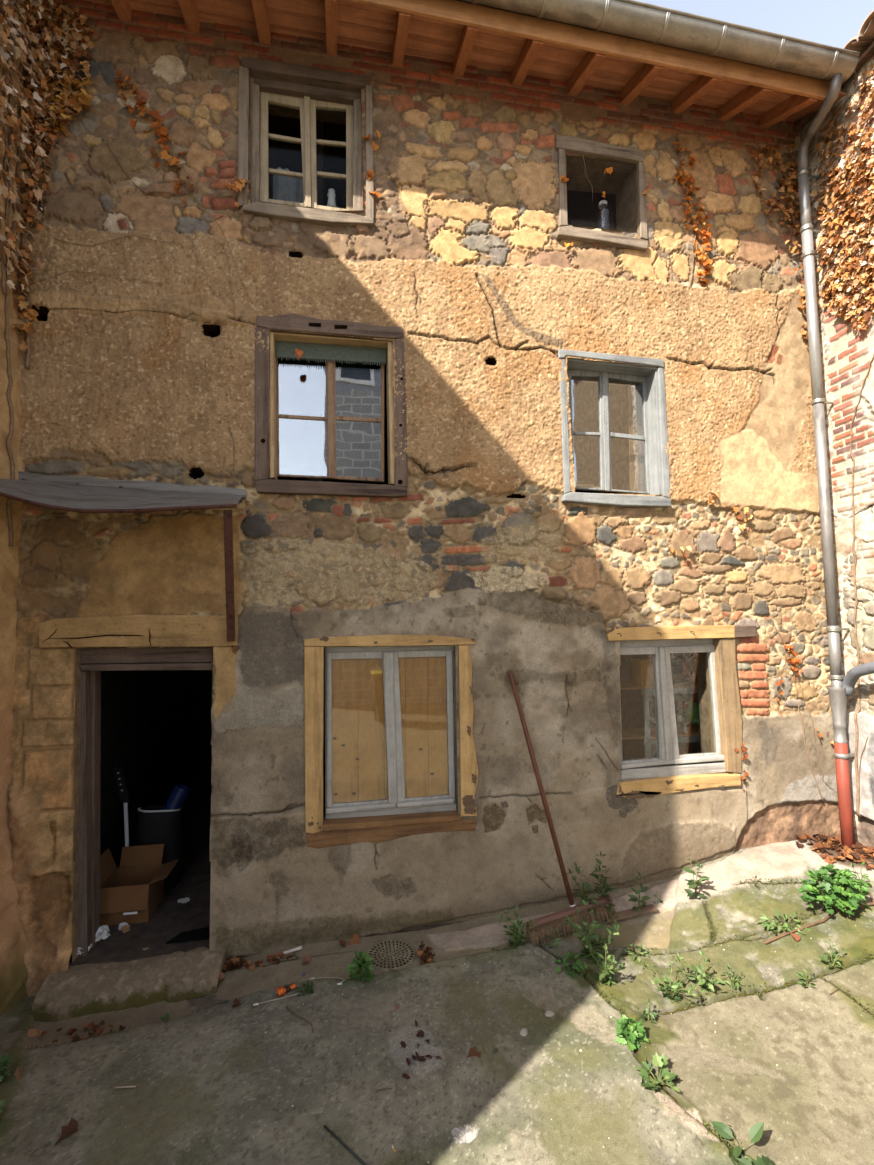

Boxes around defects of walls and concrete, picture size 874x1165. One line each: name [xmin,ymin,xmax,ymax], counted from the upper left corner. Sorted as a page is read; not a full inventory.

crack [418,273,563,356]
crack [670,359,775,382]